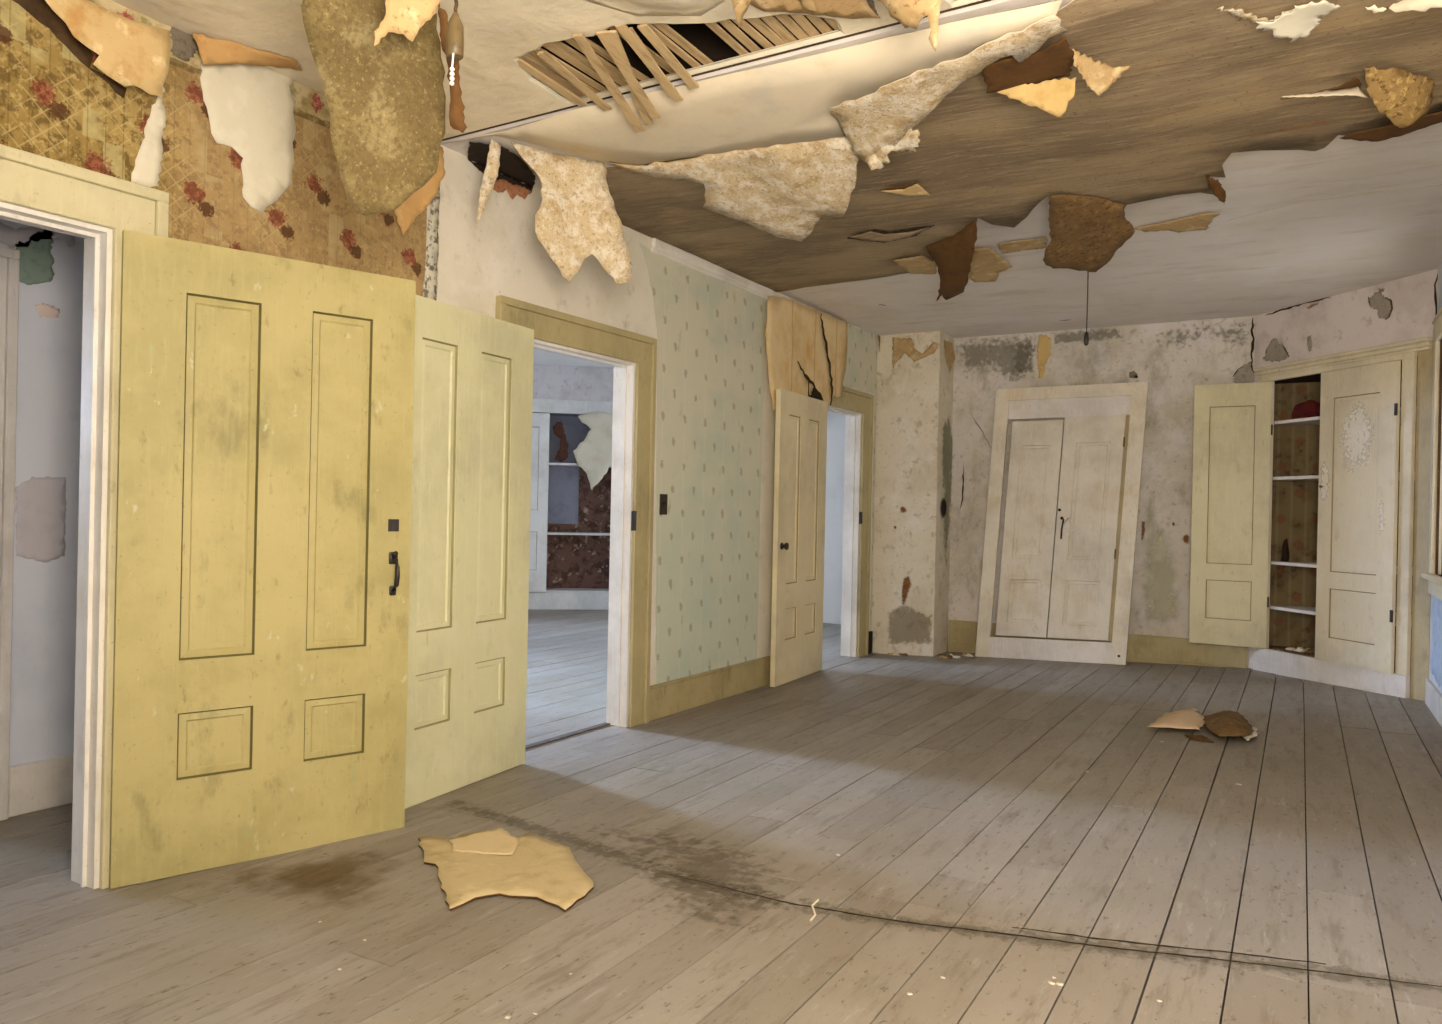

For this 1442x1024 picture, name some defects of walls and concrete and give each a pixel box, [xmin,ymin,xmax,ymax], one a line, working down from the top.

peeling [45,0,303,213]
peeling [374,0,467,133]
spalling [513,14,851,132]
peeling [1281,77,1368,99]
peeling [864,128,920,170]
peeling [476,138,533,229]
peeling [882,184,930,197]
peeling [893,256,937,274]
spalling [1368,291,1393,320]
peeling [765,296,848,411]
peeling [892,337,955,372]
corrosion [902,576,910,605]